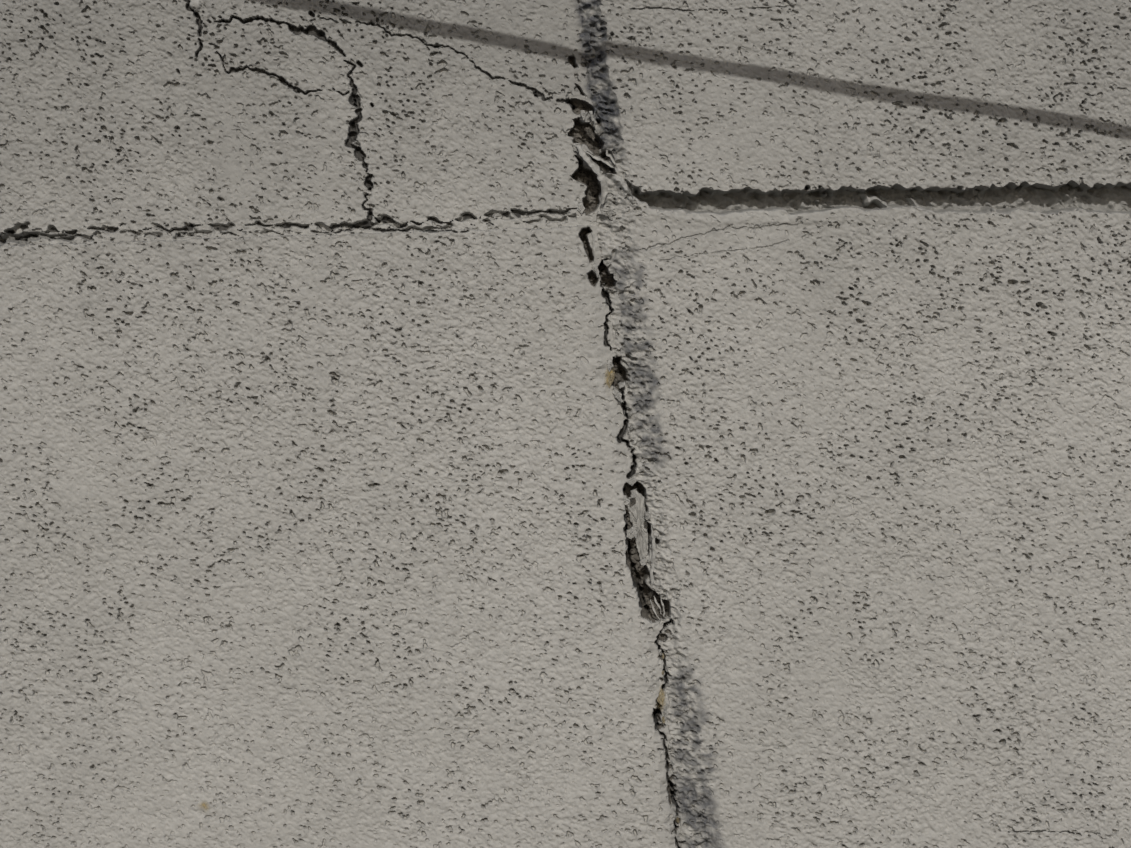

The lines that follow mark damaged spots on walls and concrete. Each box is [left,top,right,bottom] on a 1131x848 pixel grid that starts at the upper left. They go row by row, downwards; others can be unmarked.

crack [0,224,123,239]
crack [157,0,576,237]
crack [630,4,780,12]
crack [652,619,684,848]